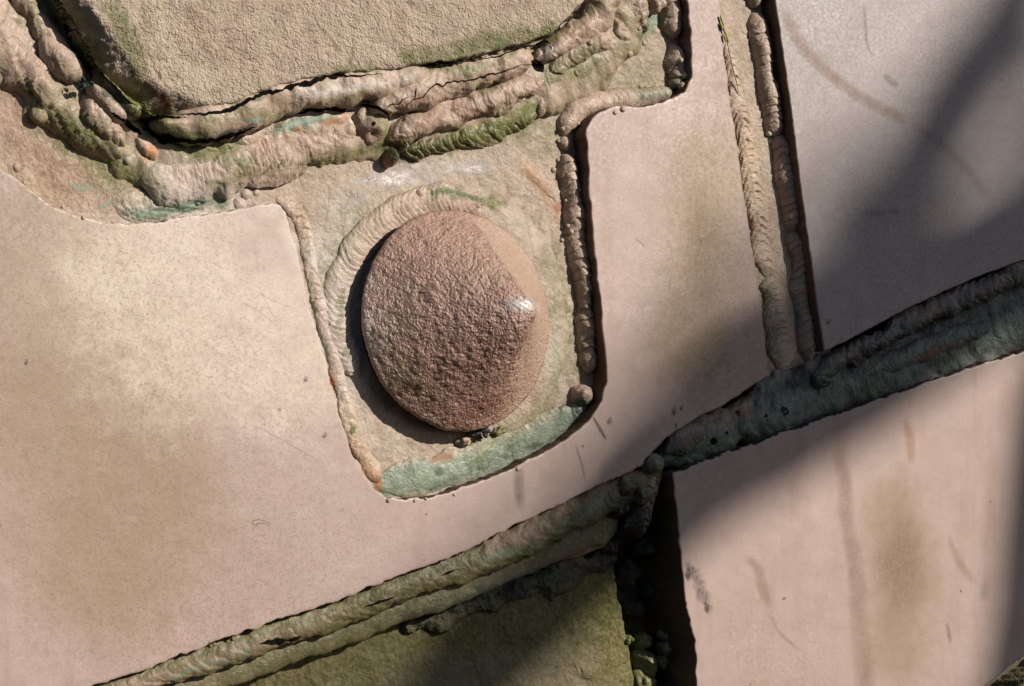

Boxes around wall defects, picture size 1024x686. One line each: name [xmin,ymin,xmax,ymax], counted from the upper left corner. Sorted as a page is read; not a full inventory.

crack [110,42,548,145]